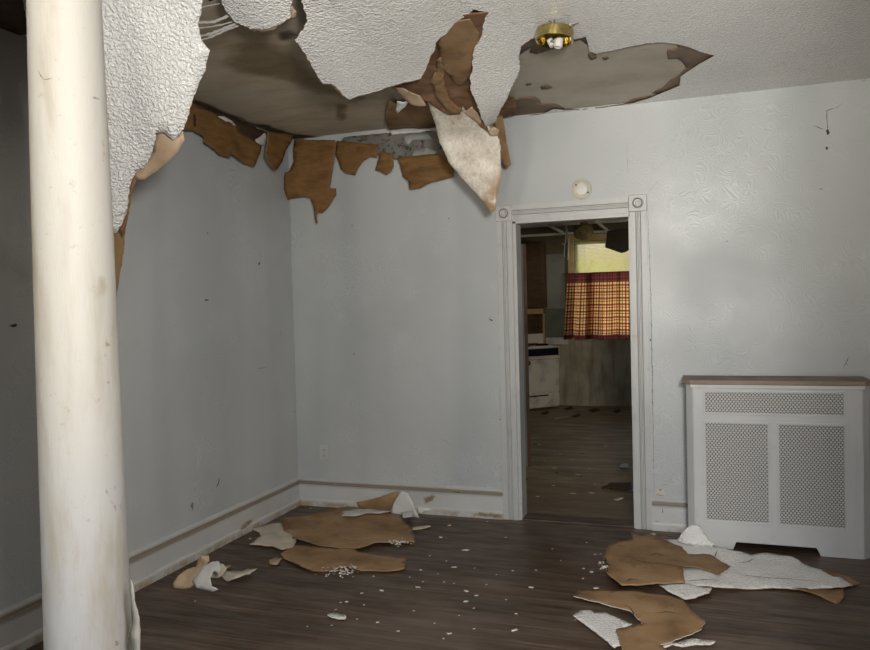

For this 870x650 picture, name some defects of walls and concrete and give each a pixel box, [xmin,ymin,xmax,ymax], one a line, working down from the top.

flaking render [183,0,454,224]
peeling [509,37,713,116]